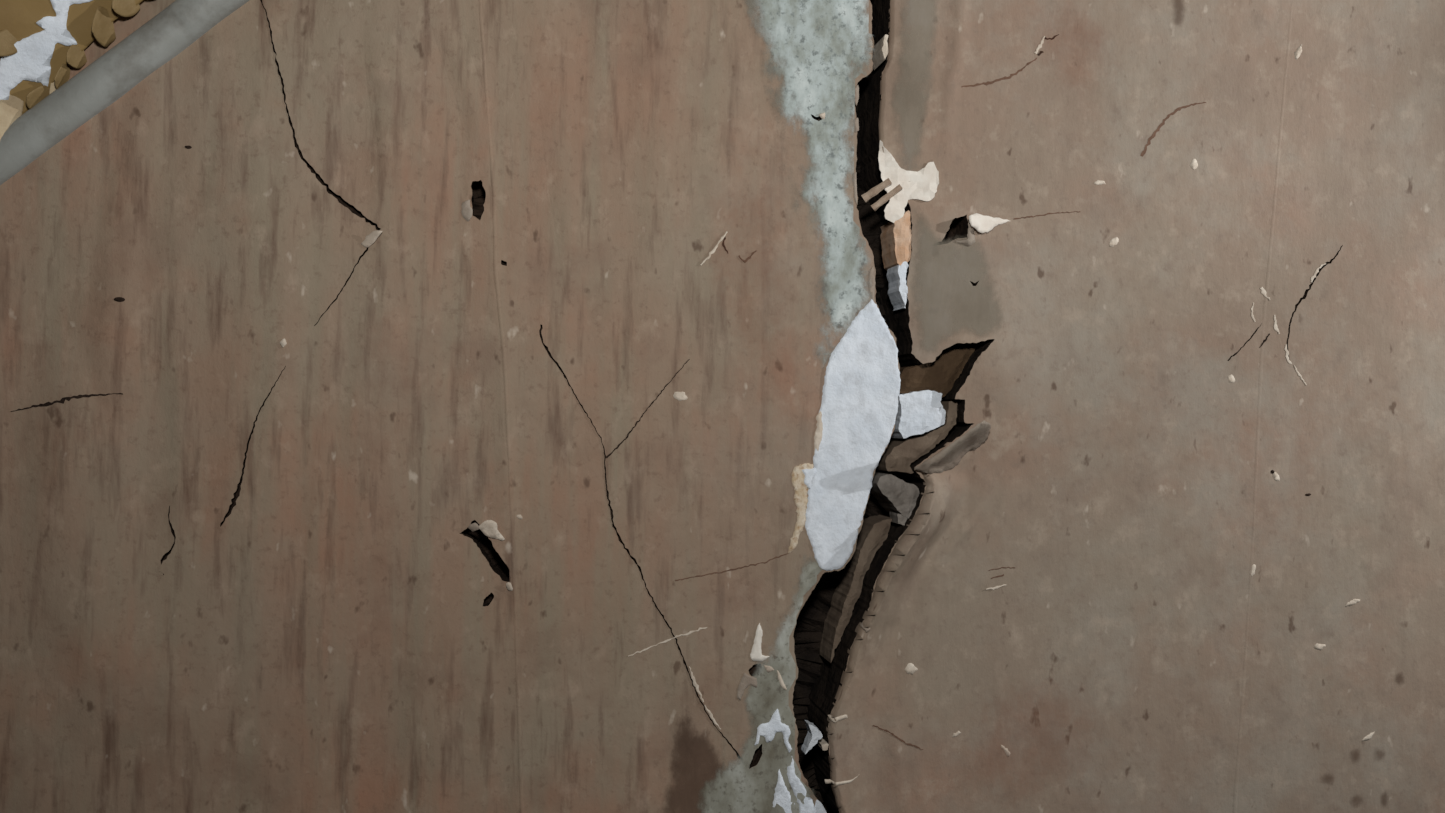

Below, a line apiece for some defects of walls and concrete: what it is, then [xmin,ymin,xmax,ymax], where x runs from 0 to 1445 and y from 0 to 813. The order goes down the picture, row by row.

peeling [0,0,140,140]
crack [220,0,382,527]
crack [539,324,741,759]
damp [748,0,870,330]
flaking render [788,299,901,571]
crack [792,0,995,813]
crack [1227,245,1343,386]
flaking render [749,709,827,813]